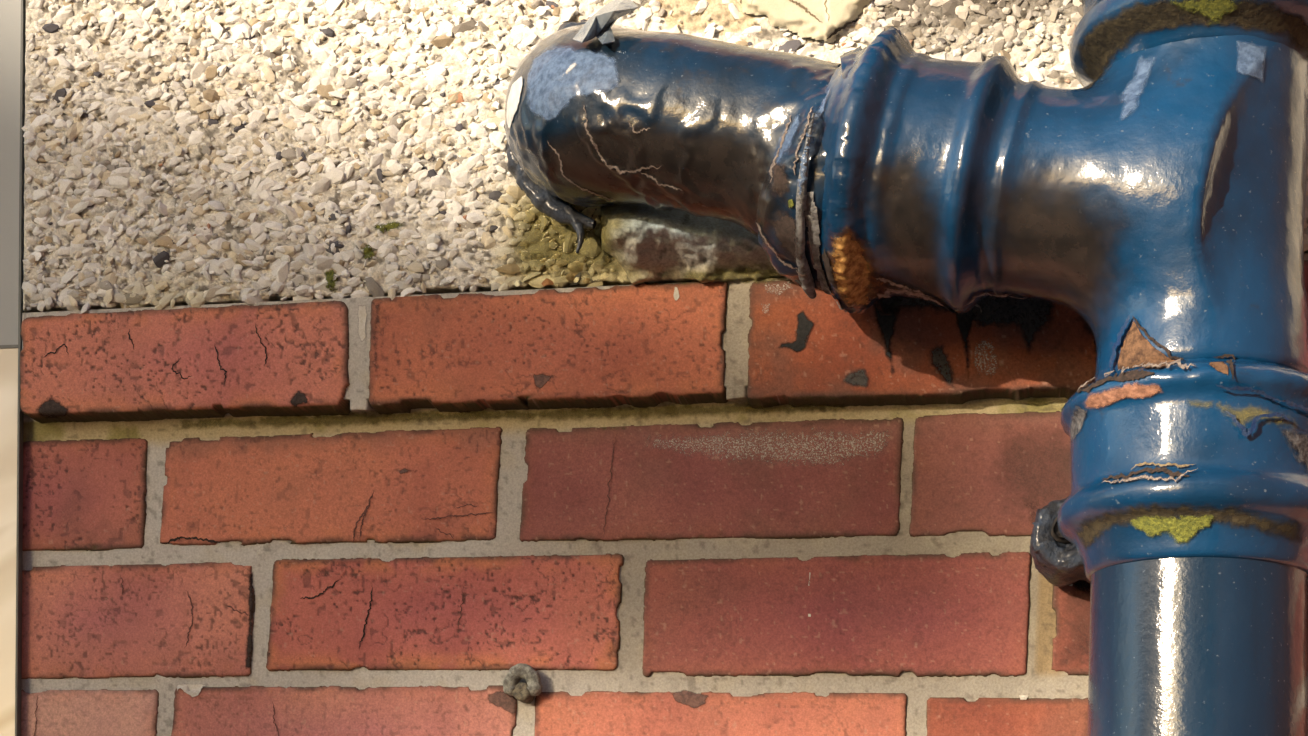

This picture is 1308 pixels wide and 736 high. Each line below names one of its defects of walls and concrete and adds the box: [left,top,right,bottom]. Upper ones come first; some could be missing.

crack [789,0,861,40]
leakage [874,296,901,373]
leakage [956,296,1054,375]
leakage [648,428,887,465]
crack [353,490,374,542]
crack [300,579,340,599]
crack [359,587,373,648]